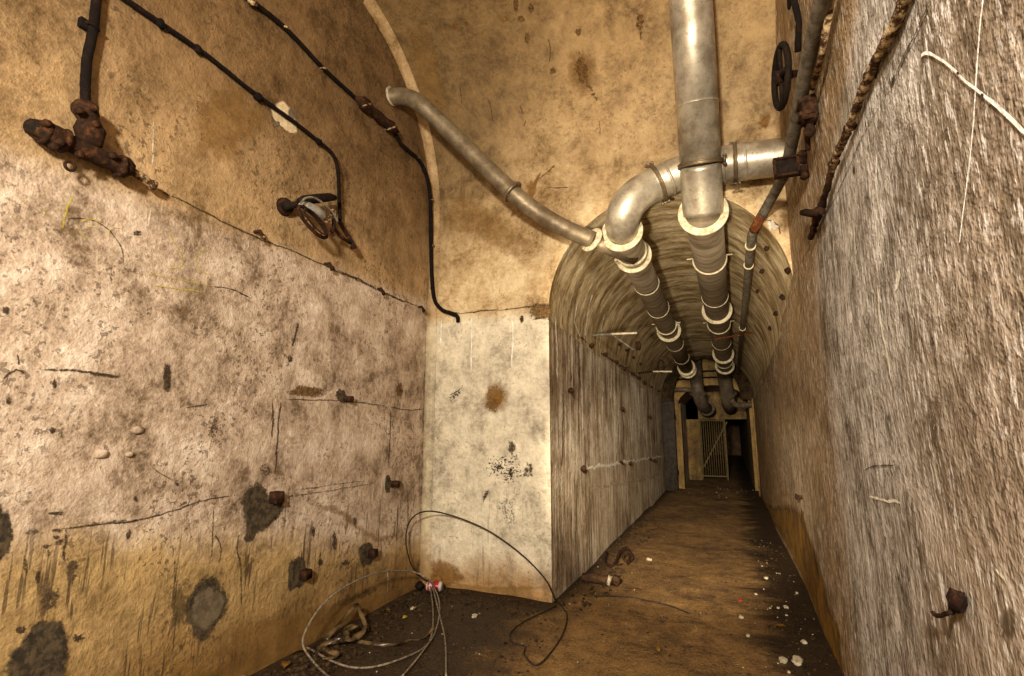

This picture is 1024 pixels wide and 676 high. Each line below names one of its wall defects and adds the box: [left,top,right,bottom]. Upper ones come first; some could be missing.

crack [158,189,416,306]
crack [4,354,116,379]
rust [485,386,504,412]
leakage [486,442,532,484]
leakage [241,464,284,542]
leakage [0,504,13,559]
crack [26,496,242,606]
leakage [288,557,306,591]
leakage [359,542,373,566]
leakage [172,576,228,641]
leakage [6,620,85,676]